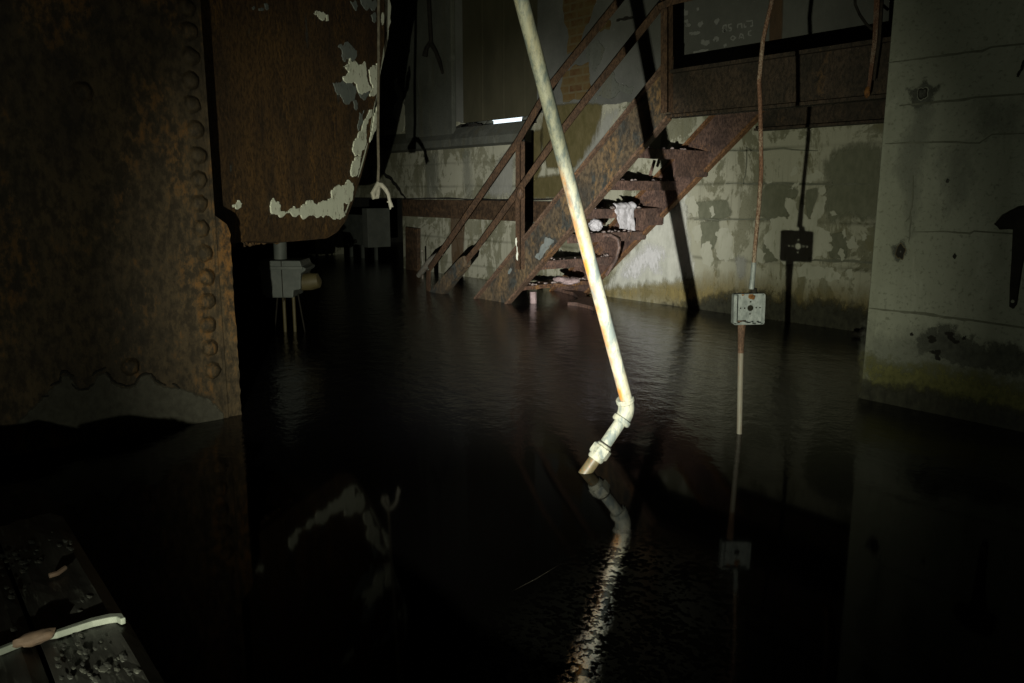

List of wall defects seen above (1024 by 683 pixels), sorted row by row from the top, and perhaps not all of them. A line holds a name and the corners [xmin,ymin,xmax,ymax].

peeling [270,0,391,220]
rust [451,218,465,265]
peeling [685,195,734,267]
leakage [605,194,868,331]
peeling [750,166,867,282]
leakage [917,325,1024,376]
rust [17,374,223,430]
leakage [858,380,1024,432]